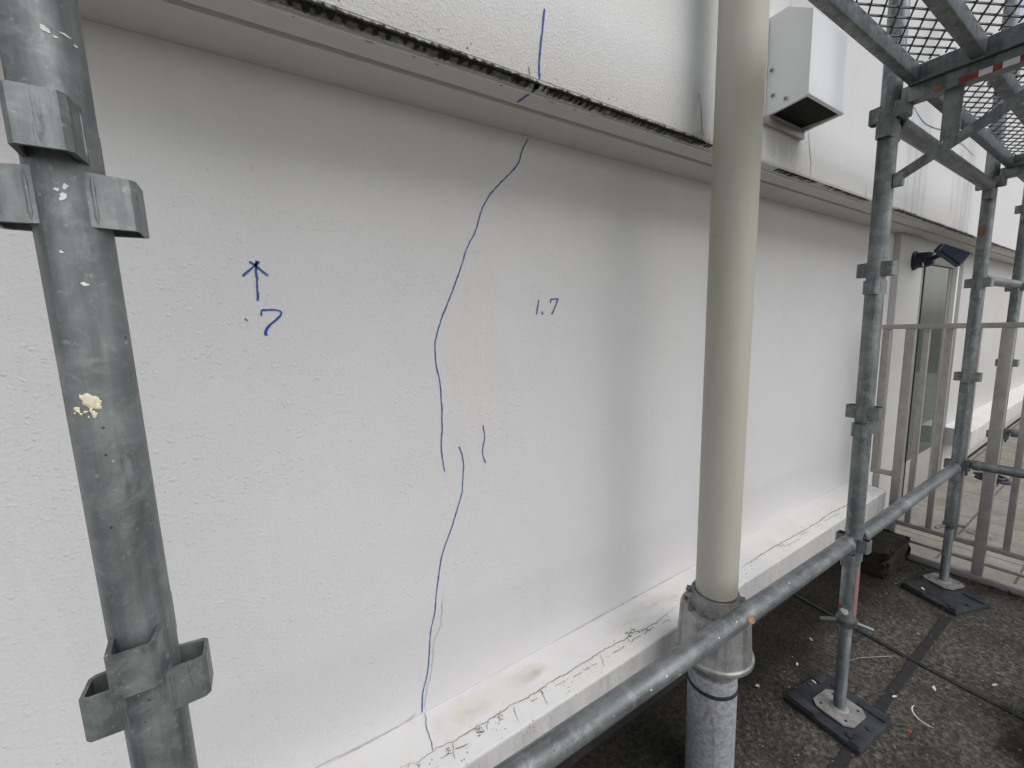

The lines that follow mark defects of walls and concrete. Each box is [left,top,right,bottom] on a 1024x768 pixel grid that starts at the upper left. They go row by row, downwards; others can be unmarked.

crack [741,505,846,568]
crack [316,595,677,768]